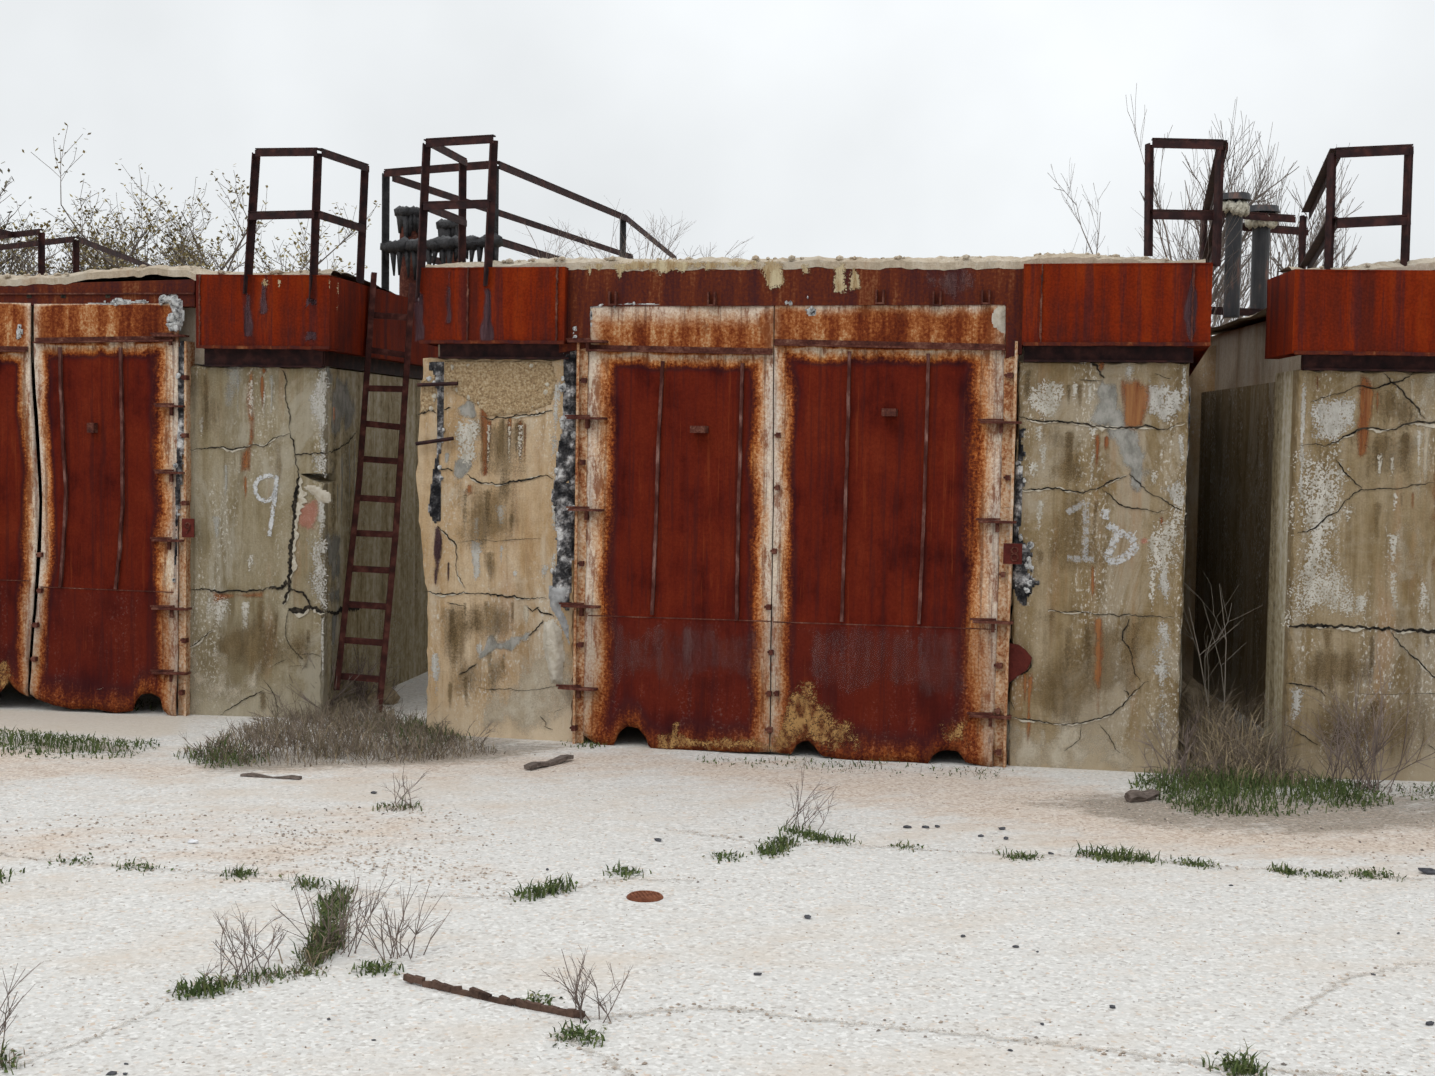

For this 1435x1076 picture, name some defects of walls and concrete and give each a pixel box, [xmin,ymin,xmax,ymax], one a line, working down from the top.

corrosion [244,284,267,337]
corrosion [480,289,494,341]
spalling [1012,378,1093,606]
crack [1019,416,1188,522]
corrosion [1122,380,1149,427]
crack [1298,372,1435,533]
damp [1376,374,1435,474]
crack [190,370,362,715]
damp [434,527,449,584]
crack [427,526,553,636]
crack [1288,623,1435,695]
corrosion [657,682,859,751]